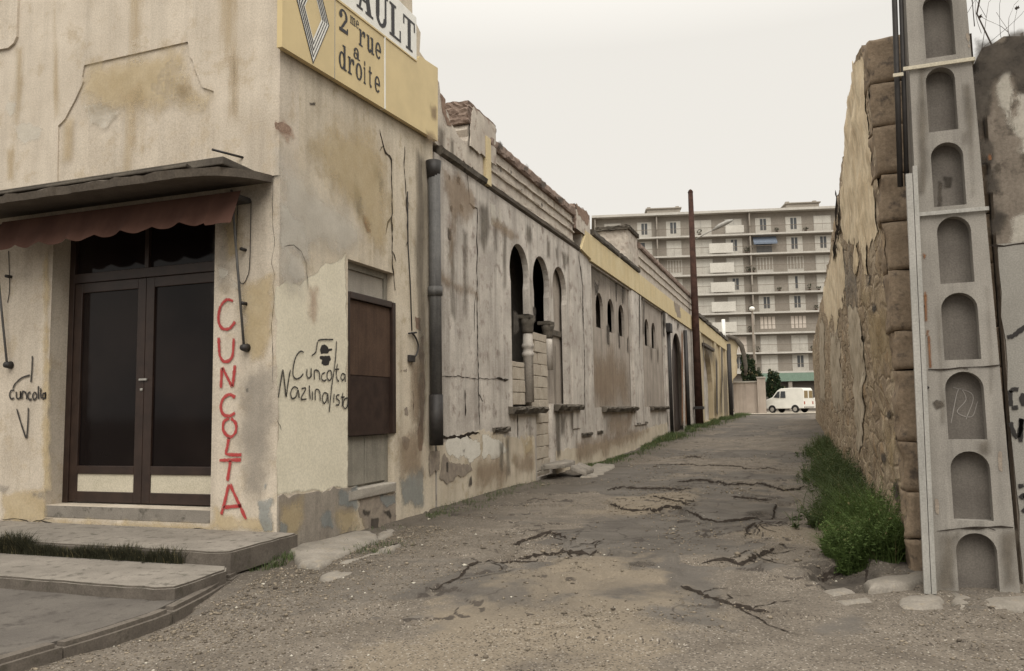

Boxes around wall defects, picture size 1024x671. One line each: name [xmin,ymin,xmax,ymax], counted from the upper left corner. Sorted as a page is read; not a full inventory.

peeling [3,326,50,522]
peeling [115,254,508,533]
crack [380,132,409,285]
crack [442,175,509,439]
water stain [447,179,514,248]